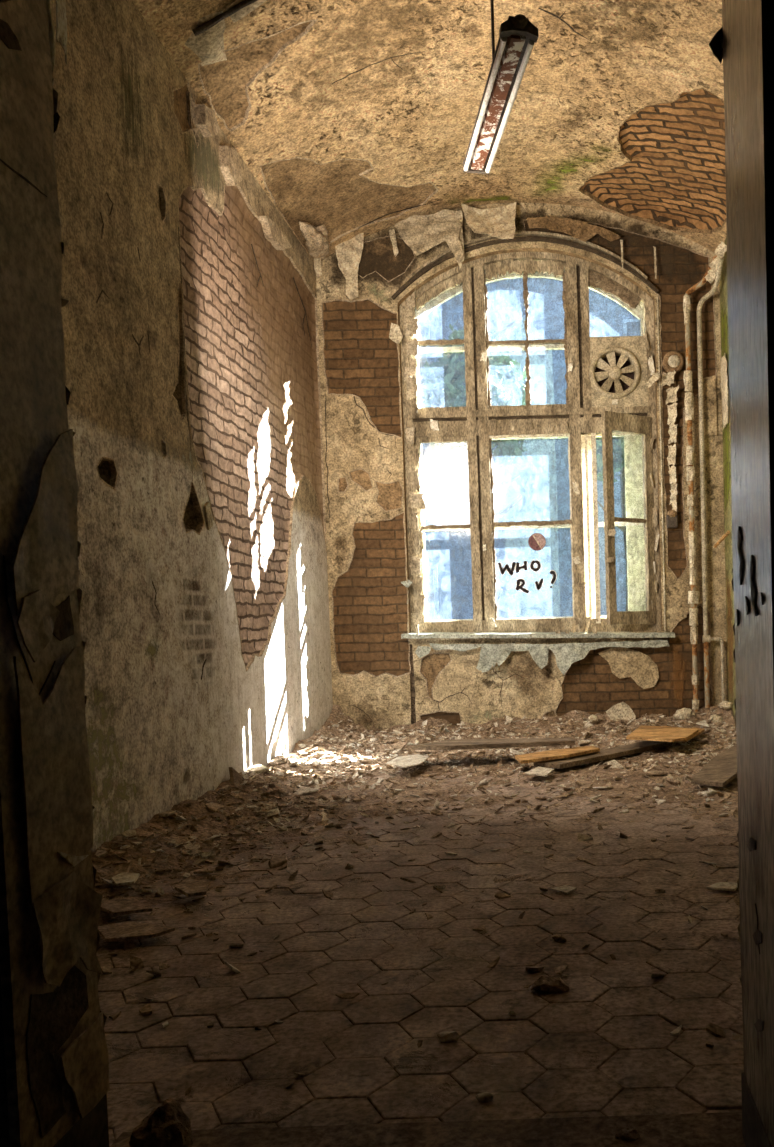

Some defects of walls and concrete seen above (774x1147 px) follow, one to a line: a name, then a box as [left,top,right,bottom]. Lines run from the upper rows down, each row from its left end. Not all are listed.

flaking render [97,457,117,490]
flaking render [158,0,728,726]